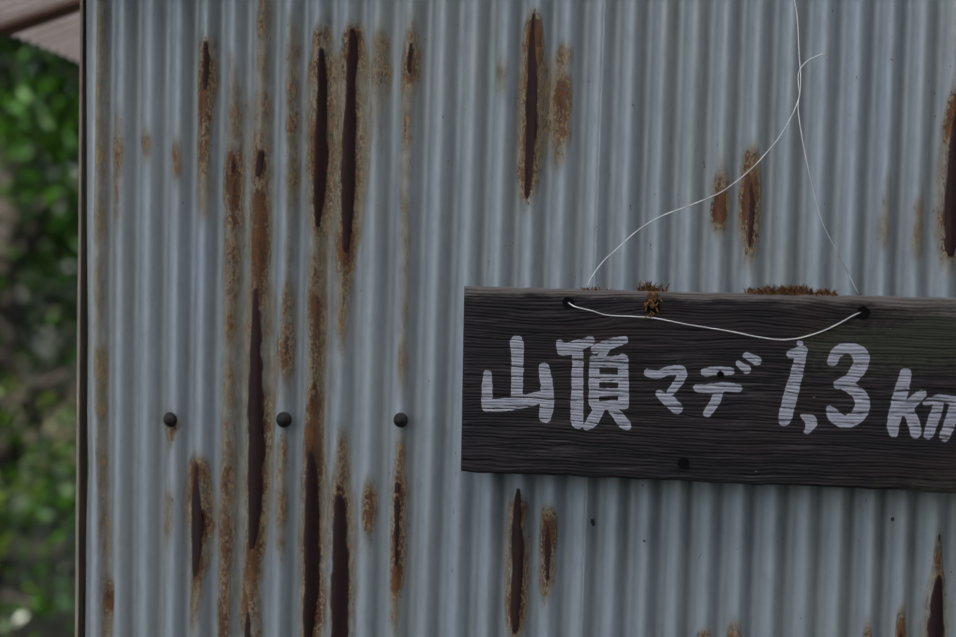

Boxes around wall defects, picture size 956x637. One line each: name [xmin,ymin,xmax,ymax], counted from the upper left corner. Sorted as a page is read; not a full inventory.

corrosion [172,142,181,177]
corrosion [516,8,573,212]
corrosion [710,143,762,262]
corrosion [912,87,956,263]
corrosion [184,0,421,637]
corrosion [505,489,558,637]
corrosion [895,608,906,637]
corrosion [918,534,946,637]